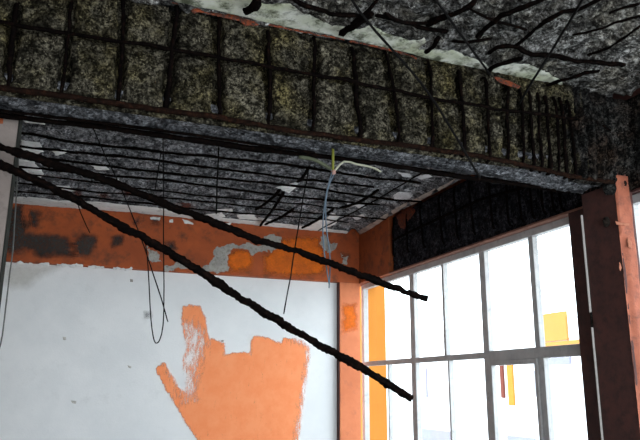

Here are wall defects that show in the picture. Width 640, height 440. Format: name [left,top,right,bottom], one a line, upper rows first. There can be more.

leakage [7,206,97,258]
spalling [0,0,640,274]